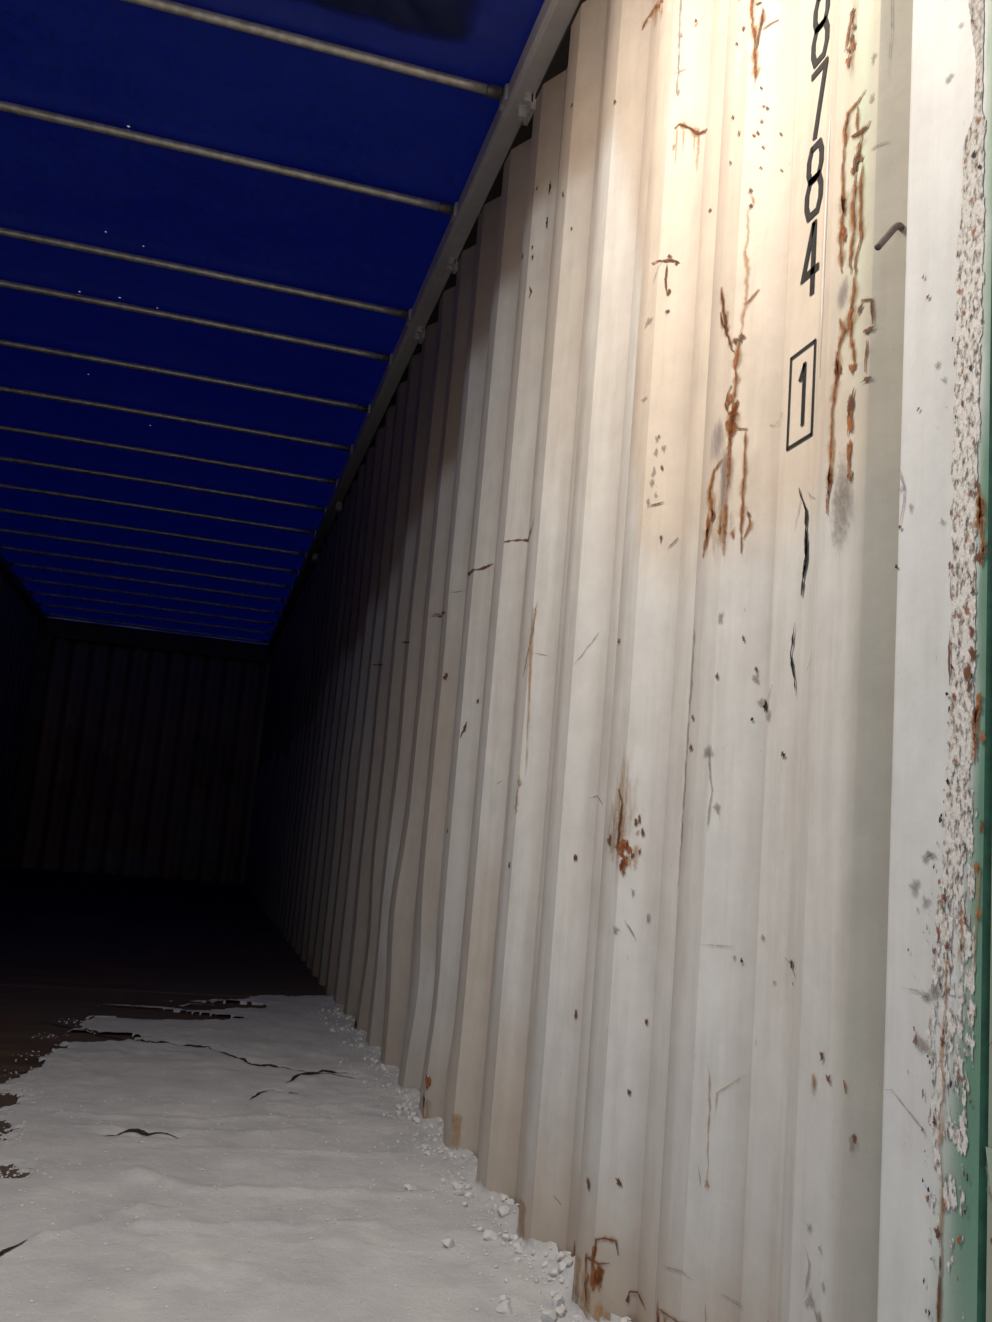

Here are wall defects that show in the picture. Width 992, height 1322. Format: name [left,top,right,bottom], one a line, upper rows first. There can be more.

corrosion [750,0,779,86]
corrosion [844,8,855,69]
corrosion [674,123,707,154]
corrosion [826,89,882,540]
peeling [910,0,986,1284]
corrosion [607,786,644,875]
corrosion [572,1237,619,1320]